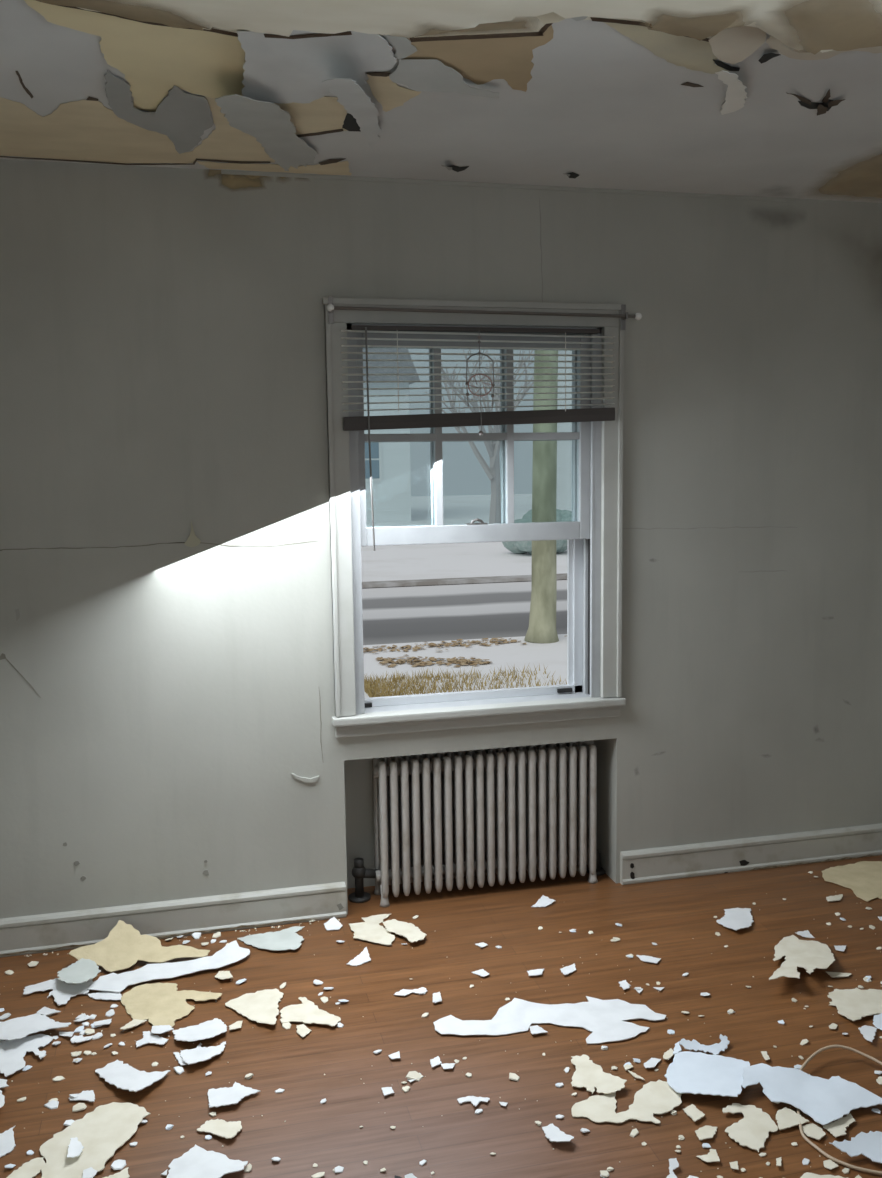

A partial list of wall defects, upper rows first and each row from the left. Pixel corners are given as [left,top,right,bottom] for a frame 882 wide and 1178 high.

peeling [0,0,554,176]
peeling [604,22,882,115]
crack [0,521,315,550]